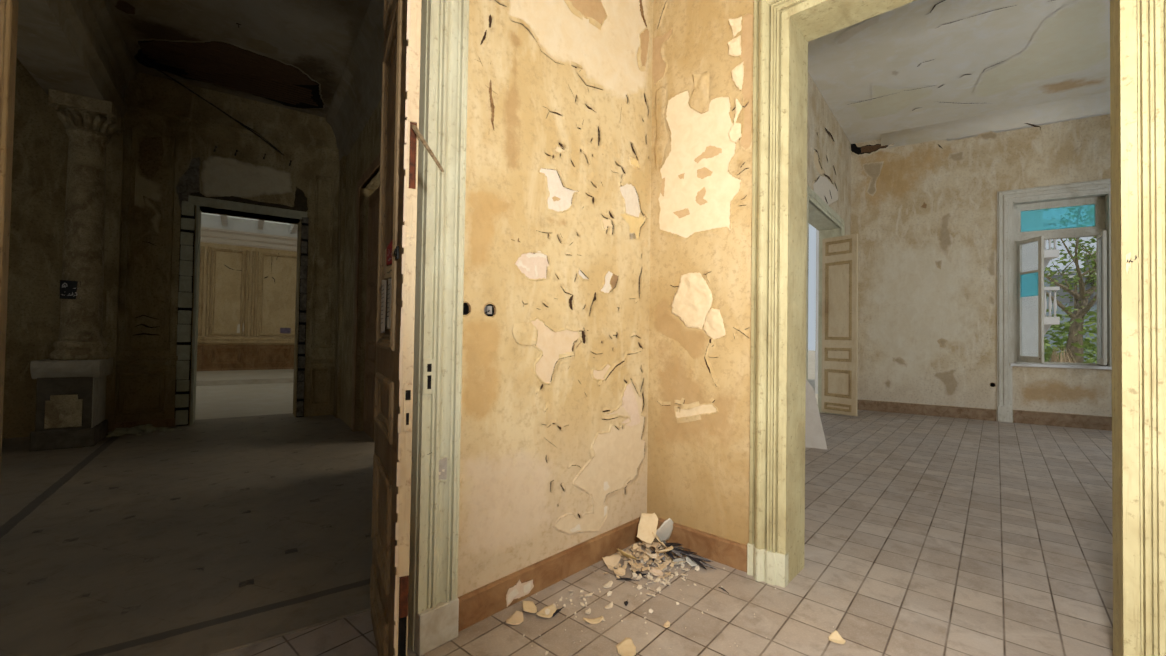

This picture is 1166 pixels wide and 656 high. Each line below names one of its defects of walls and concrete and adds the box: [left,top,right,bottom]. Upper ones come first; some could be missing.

crack [926,0,1016,28]
peeling [505,0,754,243]
crack [848,59,1003,111]
flaking render [134,134,308,212]
peeling [513,246,553,281]
peeling [528,317,582,385]
peeling [577,265,621,299]
crack [475,0,751,494]
peeling [653,272,726,360]
peeling [674,401,719,423]
crack [542,419,583,518]
peeling [553,377,647,536]